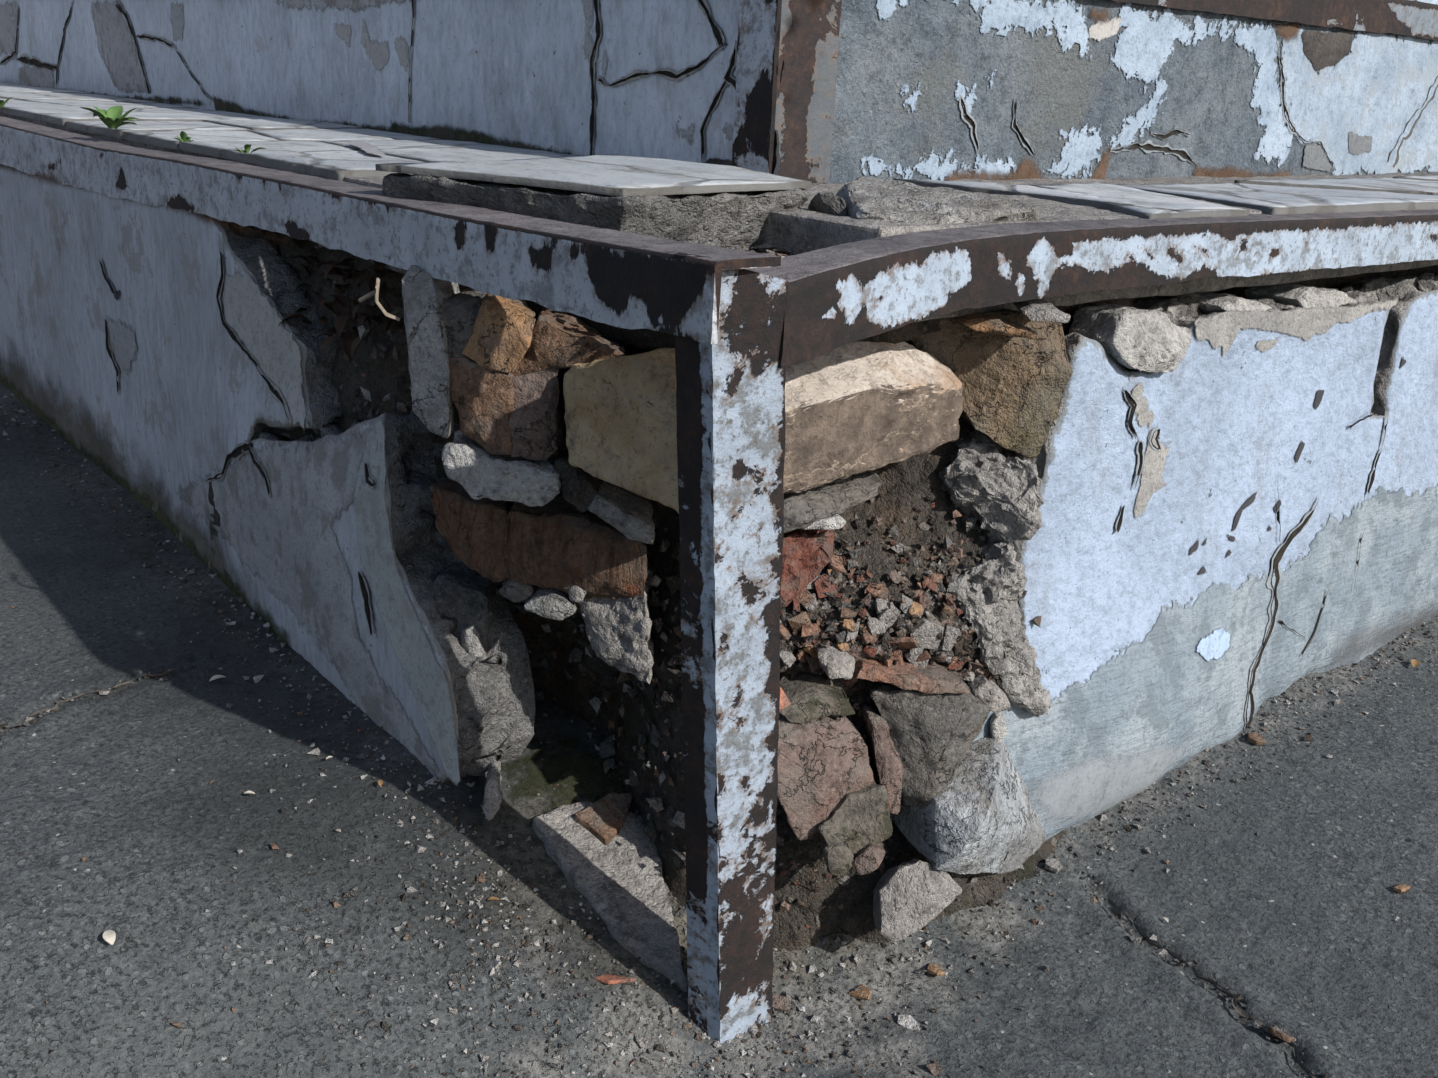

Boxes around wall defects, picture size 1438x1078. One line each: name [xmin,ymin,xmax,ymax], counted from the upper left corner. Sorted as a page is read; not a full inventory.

peeling [875,0,928,21]
corrosion [1091,10,1108,21]
corrosion [1275,22,1300,40]
crack [588,0,737,163]
peeling [951,0,1438,179]
peeling [859,149,1017,181]
crack [959,95,979,153]
crack [1110,129,1200,168]
crack [216,234,292,424]
peeling [1194,300,1398,356]
crack [1244,413,1388,730]
peeling [973,486,1438,842]